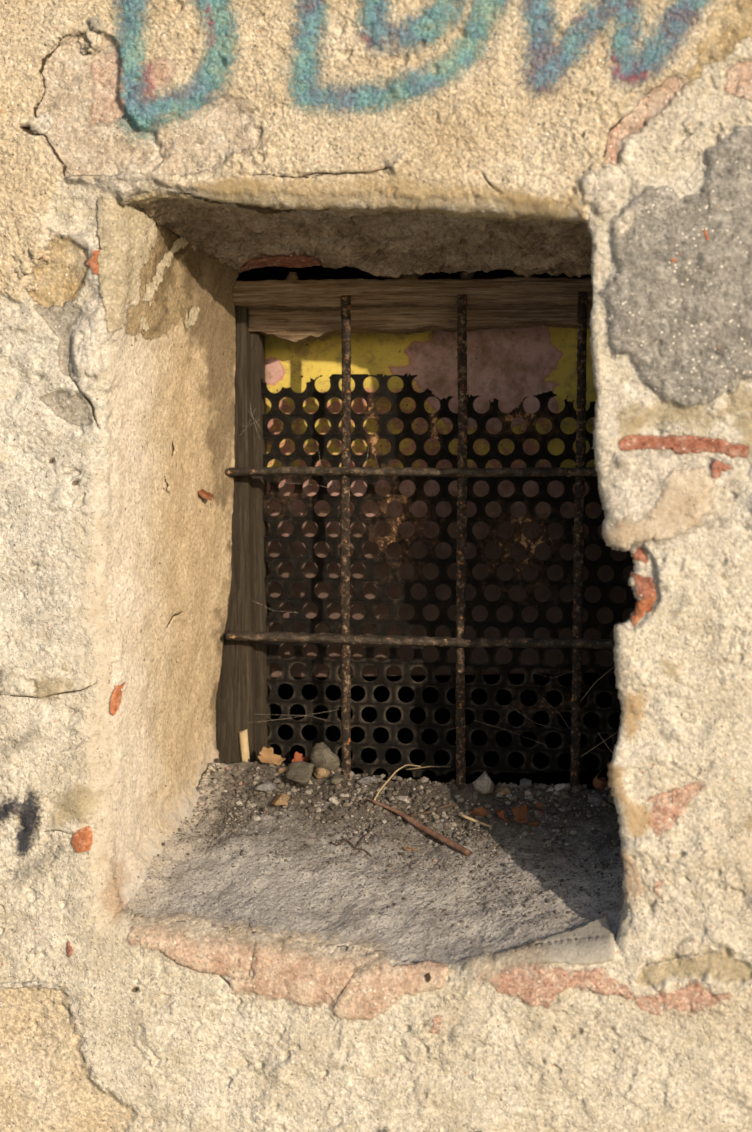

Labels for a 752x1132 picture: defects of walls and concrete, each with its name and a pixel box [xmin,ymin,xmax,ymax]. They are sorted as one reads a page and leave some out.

crack [20,33,85,178]
flaking render [23,16,266,181]
crack [181,192,329,215]
crack [253,167,390,178]
flaking render [604,0,752,165]
flaking render [602,434,749,630]
flaking render [127,913,449,1020]
flaking render [468,942,731,1015]
flaking render [0,981,135,1132]